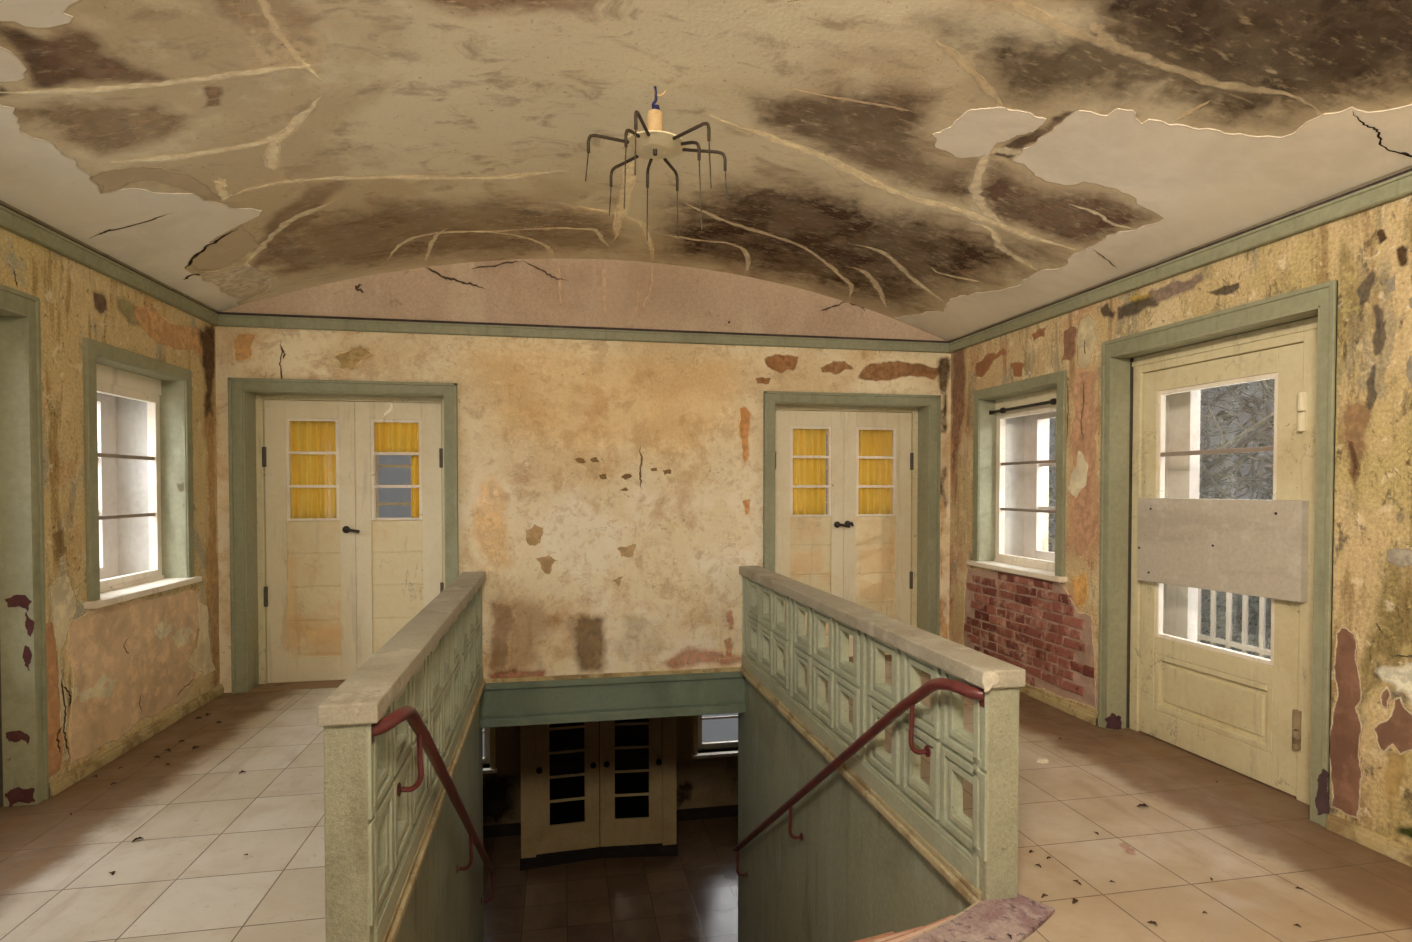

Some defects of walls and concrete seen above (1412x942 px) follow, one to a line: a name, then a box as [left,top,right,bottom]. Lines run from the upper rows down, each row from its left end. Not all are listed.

damp [436,0,541,11]
damp [995,0,1412,118]
peeling [0,0,262,312]
damp [279,204,612,267]
damp [670,190,1014,303]
damp [763,92,1143,241]
peeling [894,104,1412,341]
peeling [756,355,798,384]
peeling [821,361,939,381]
peeling [5,570,216,778]
flaking render [963,568,1122,729]
flaking render [1315,627,1412,818]